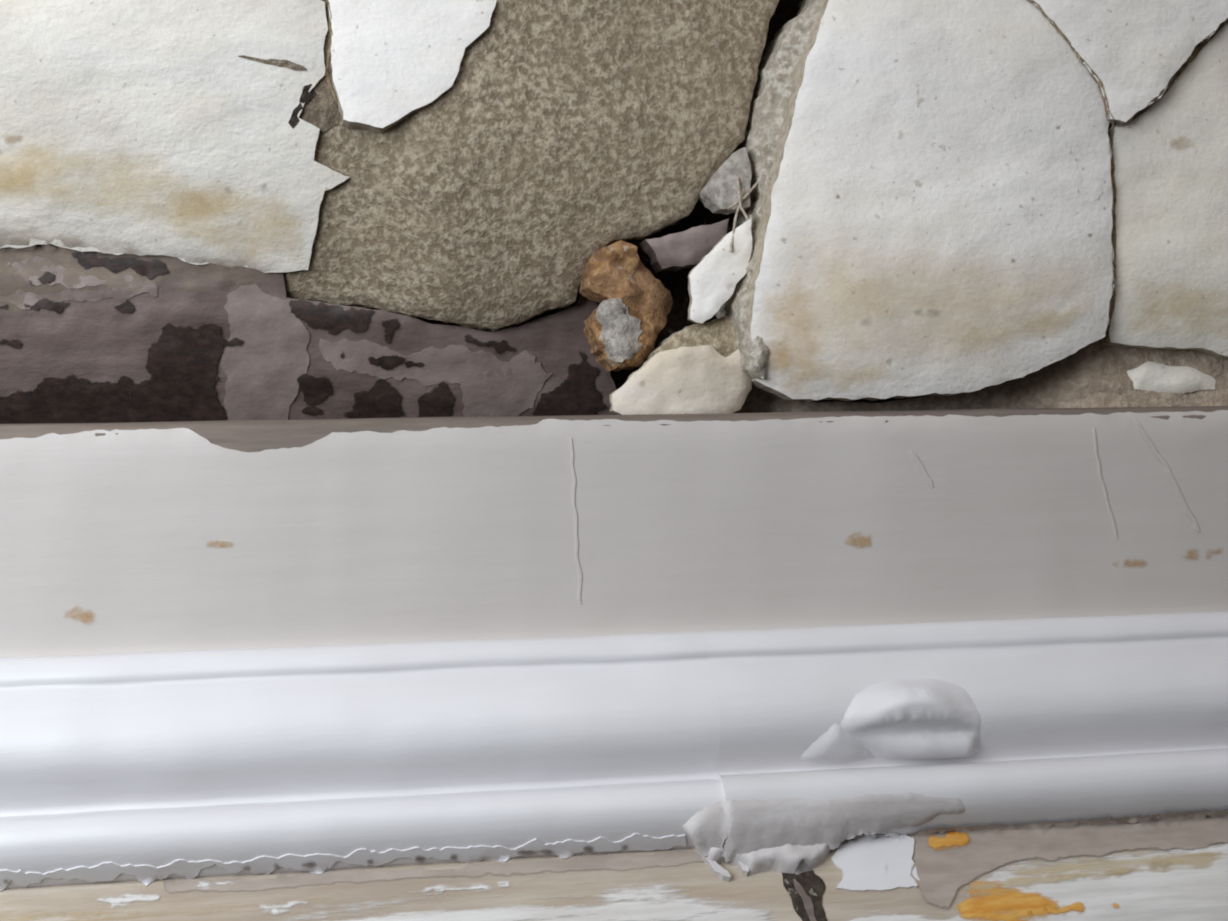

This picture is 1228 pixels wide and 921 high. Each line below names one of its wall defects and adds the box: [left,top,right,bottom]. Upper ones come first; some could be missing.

spalling [0,0,779,424]
spalling [734,340,1228,413]
peeling [0,833,704,919]
peeling [341,884,772,921]
peeling [831,809,1228,921]
corrosion [957,867,1132,921]